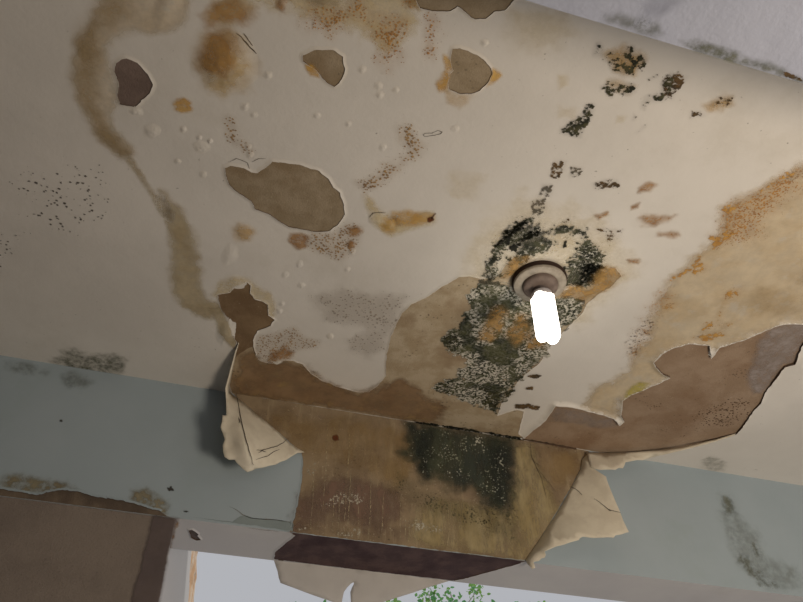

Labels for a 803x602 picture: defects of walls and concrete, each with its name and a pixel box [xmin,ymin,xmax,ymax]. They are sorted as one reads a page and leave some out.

spalling [415,0,518,22]
spalling [110,54,157,109]
spalling [299,46,349,89]
spalling [445,44,496,96]
mould [598,45,646,96]
water stain [643,71,684,107]
mould [562,104,595,137]
spalling [221,158,349,234]
mould [432,161,621,414]
water stain [584,167,803,416]
spalling [216,254,803,602]
mould [396,422,563,543]